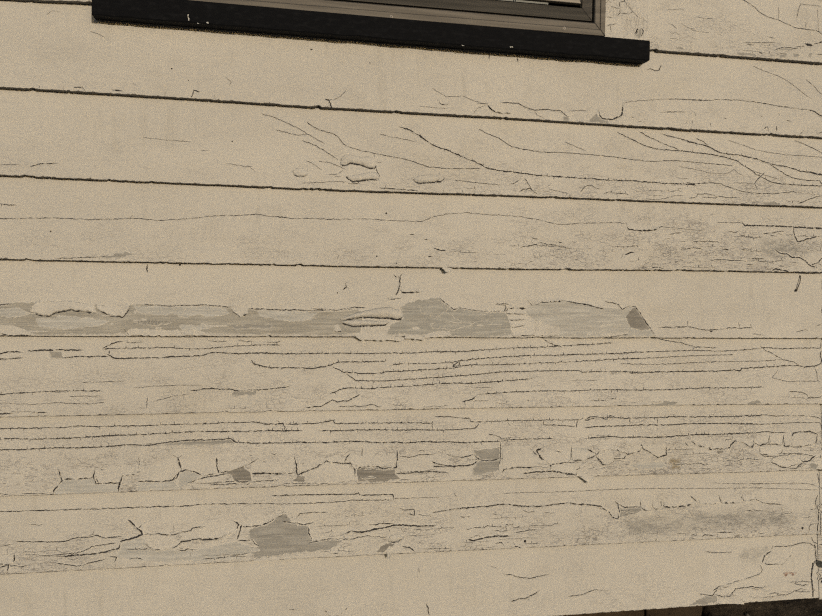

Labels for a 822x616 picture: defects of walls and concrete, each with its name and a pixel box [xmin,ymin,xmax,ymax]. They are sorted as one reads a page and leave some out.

crack [605,0,645,39]
crack [740,0,822,46]
crack [261,64,822,205]
crack [0,160,58,168]
crack [0,202,627,226]
peeling [0,296,657,347]
peeling [0,348,111,361]
crack [0,221,822,603]
peeling [22,429,822,495]
peeling [0,510,456,572]
peeling [375,512,562,560]
peeling [688,541,822,606]